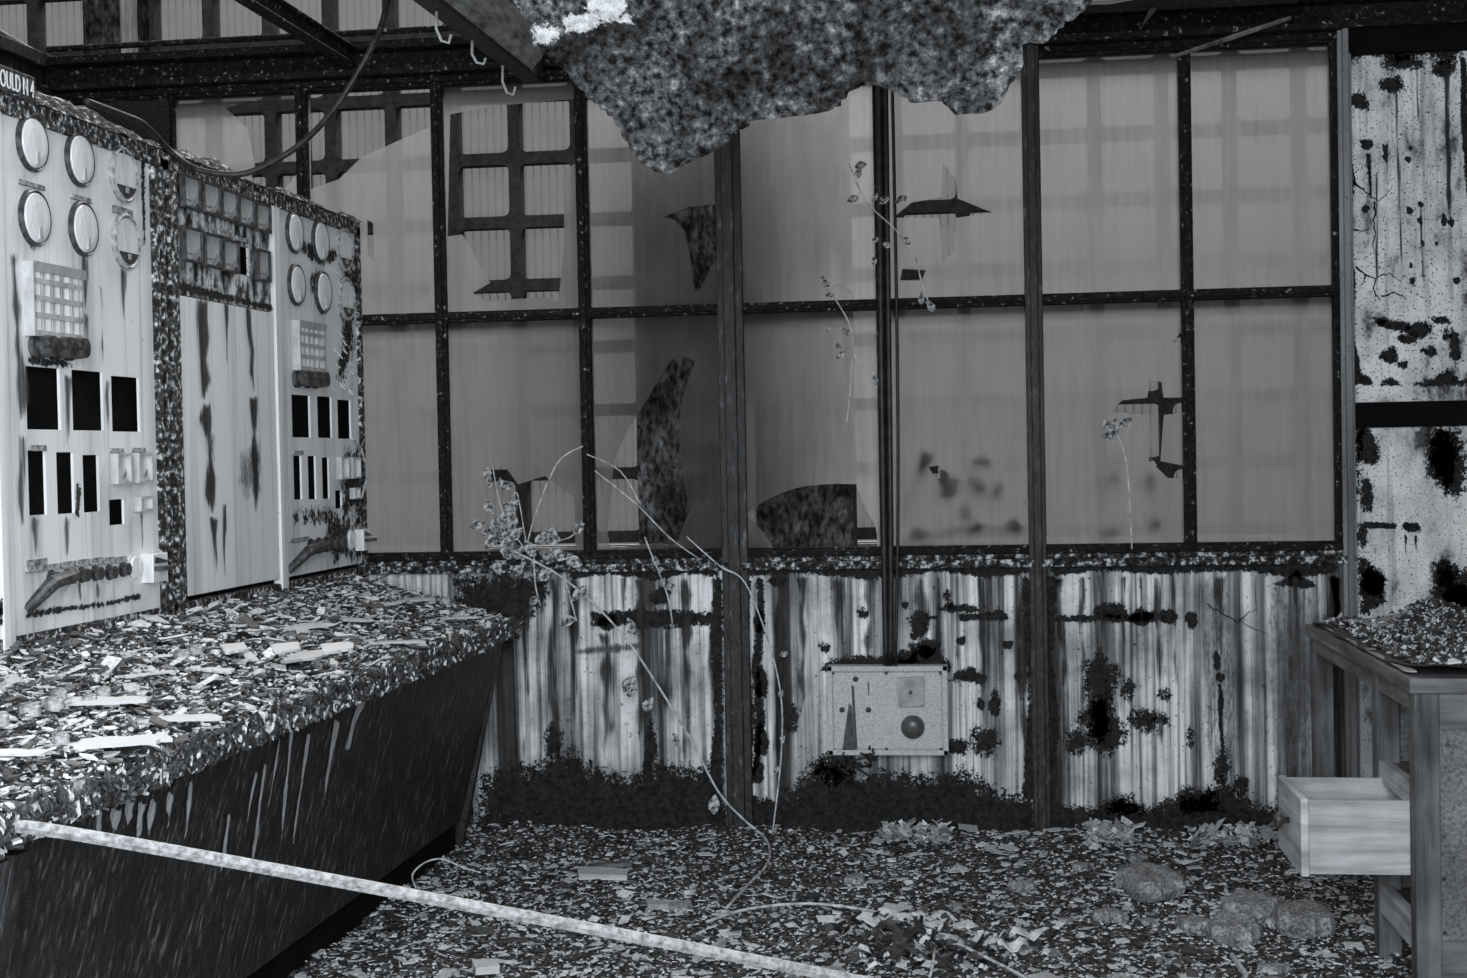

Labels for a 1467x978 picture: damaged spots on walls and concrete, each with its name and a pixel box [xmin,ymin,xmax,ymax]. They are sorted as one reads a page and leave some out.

water stain [1351,51,1467,285]
water stain [1353,262,1467,388]
water stain [1423,426,1467,503]
water stain [749,428,1387,833]
water stain [1425,559,1467,610]